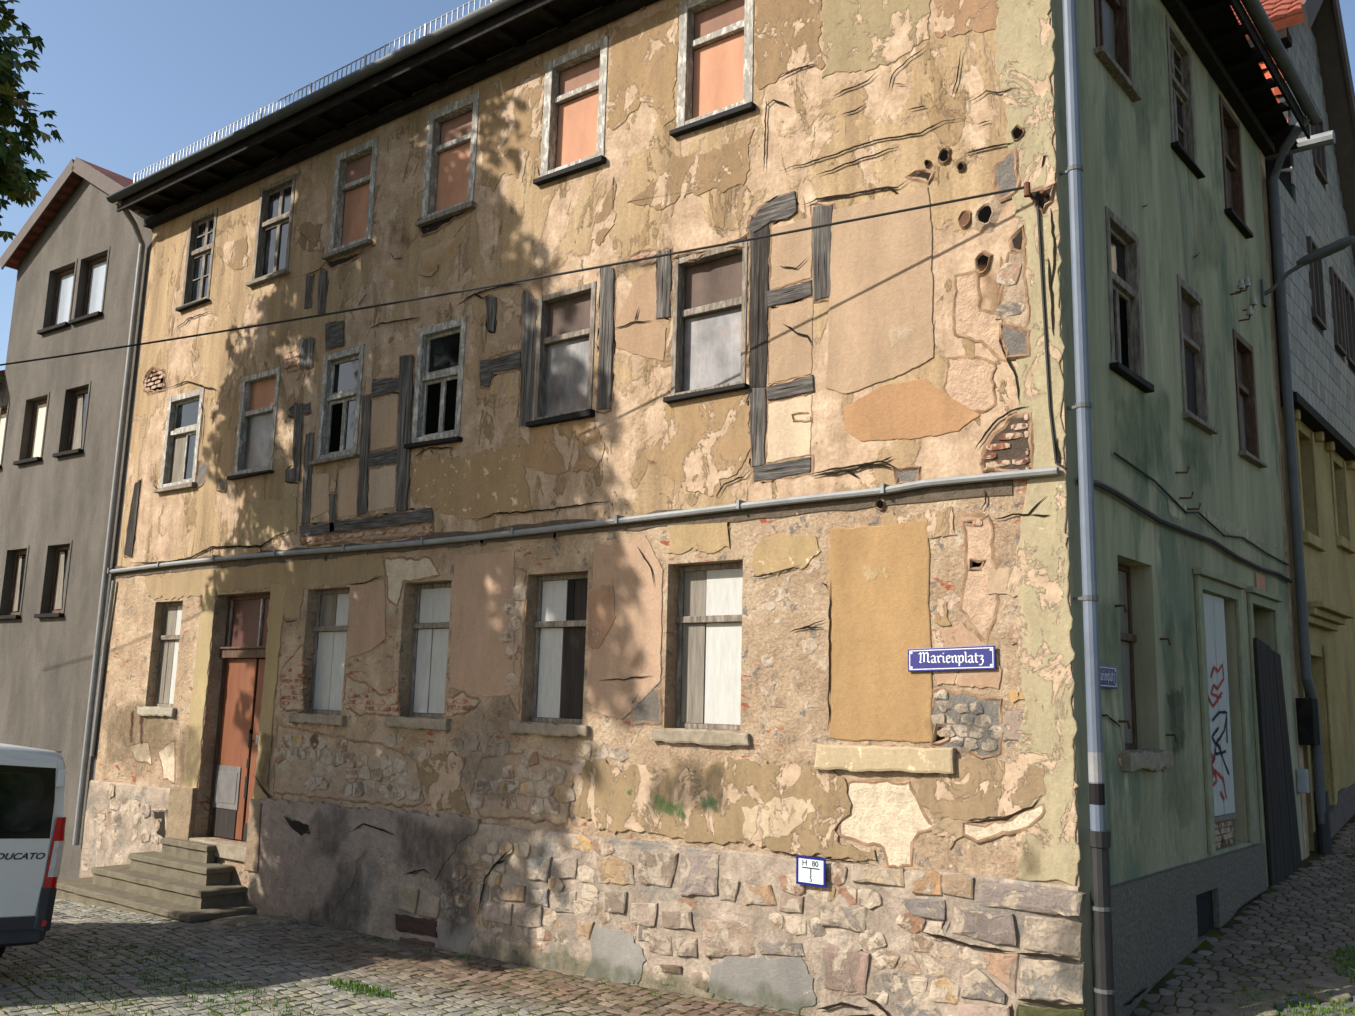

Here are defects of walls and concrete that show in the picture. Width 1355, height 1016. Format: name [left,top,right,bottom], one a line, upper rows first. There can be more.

flaking render [606,2,679,131]
flaking render [591,129,754,246]
crack [763,45,1014,205]
flaking render [905,168,936,186]
flaking render [991,147,1057,214]
flaking render [942,225,1035,473]
flaking render [645,389,751,498]
flaking render [253,507,1047,919]
crack [967,796,1041,823]
crack [478,848,512,912]